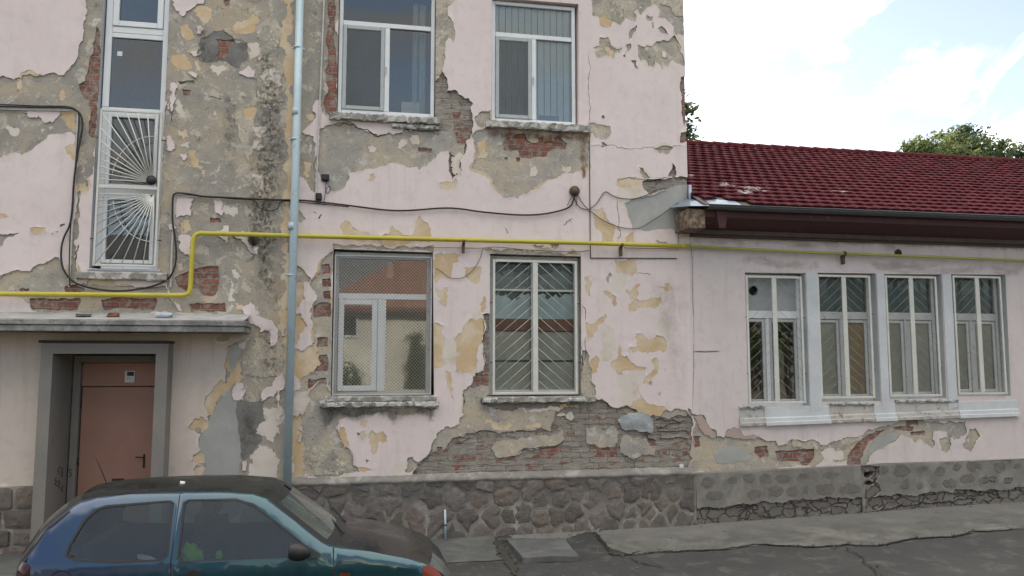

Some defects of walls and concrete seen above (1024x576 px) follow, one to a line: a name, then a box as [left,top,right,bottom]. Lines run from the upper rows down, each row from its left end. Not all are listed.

water stain [253,58,280,290]
spalling [0,0,611,478]
spalling [591,0,686,155]
spalling [390,259,983,475]